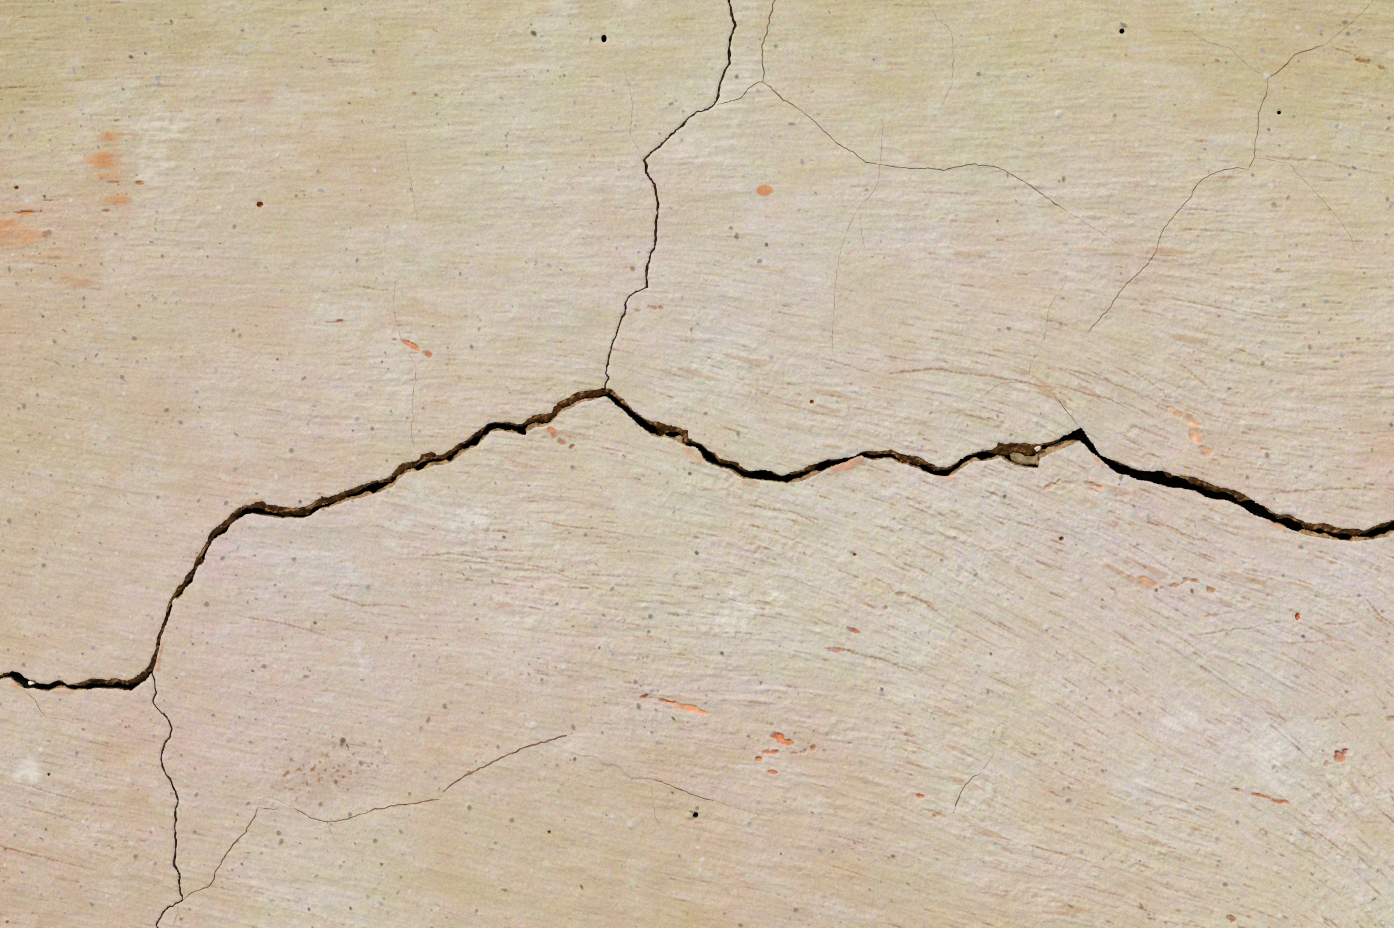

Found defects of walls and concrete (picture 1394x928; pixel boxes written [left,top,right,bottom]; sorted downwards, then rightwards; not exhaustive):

crack [603,0,737,390]
crack [761,0,775,79]
crack [765,83,832,138]
crack [836,142,1065,210]
crack [1091,6,1368,328]
crack [0,388,1394,928]